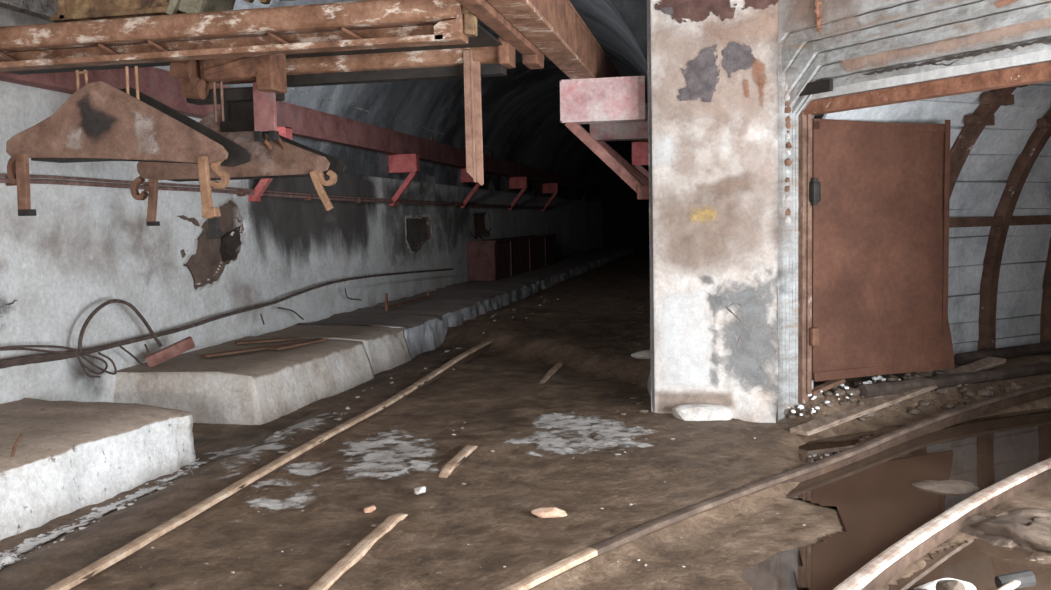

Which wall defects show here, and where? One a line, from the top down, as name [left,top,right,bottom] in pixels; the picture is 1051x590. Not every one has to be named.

corrosion [814,0,822,32]
damp [284,83,369,117]
damp [658,139,694,173]
peeling [647,0,778,239]
damp [654,0,855,158]
spalling [177,197,246,291]
damp [238,173,468,259]
damp [658,158,786,411]
damp [506,413,653,457]